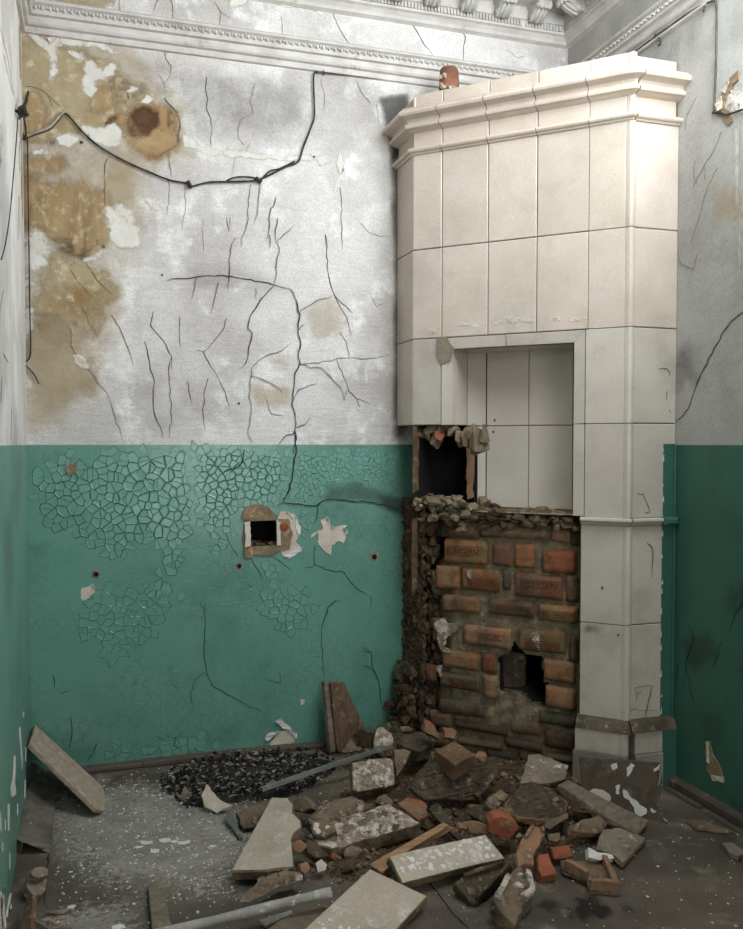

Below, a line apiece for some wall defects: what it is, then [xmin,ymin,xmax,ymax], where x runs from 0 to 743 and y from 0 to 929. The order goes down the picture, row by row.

crack [0,28,64,111]
damp [19,25,146,349]
crack [146,52,204,246]
crack [678,132,721,269]
flaking render [715,70,741,125]
crack [70,84,402,522]
crack [666,312,743,421]
flaking render [242,504,348,559]
crack [226,534,372,608]
peeling [0,712,31,870]
peeling [705,741,725,783]
flaking render [0,892,12,929]